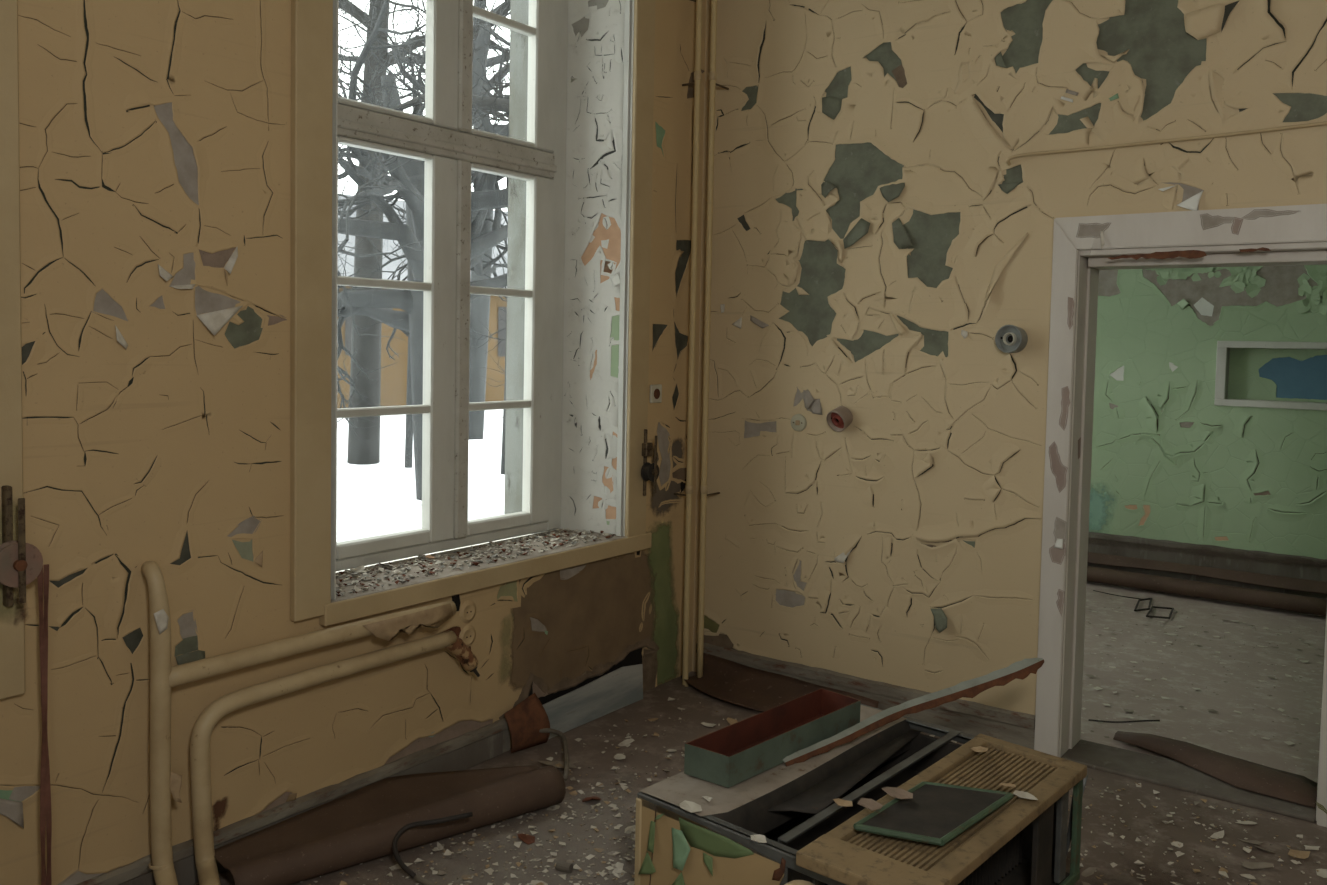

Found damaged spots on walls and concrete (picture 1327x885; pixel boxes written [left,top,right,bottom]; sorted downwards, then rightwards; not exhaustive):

peeling [960,0,1248,203]
peeling [1262,82,1327,137]
peeling [158,239,291,363]
peeling [576,208,621,386]
peeling [732,31,976,371]
crack [563,0,1327,667]
peeling [1076,177,1327,328]
crack [0,0,286,870]
spalling [499,637,659,719]